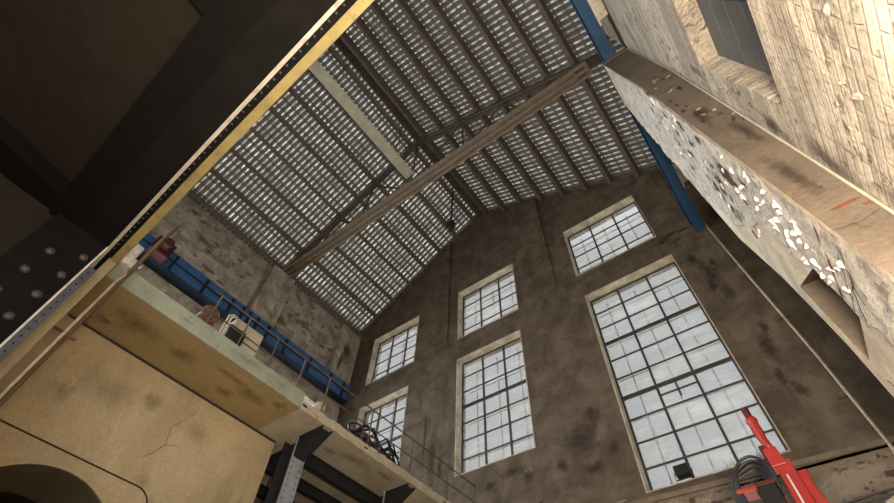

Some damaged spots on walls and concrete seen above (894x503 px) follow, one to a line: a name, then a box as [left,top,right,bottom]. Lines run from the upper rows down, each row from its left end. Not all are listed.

crack [836,208,880,328]
peeling [820,454,894,501]